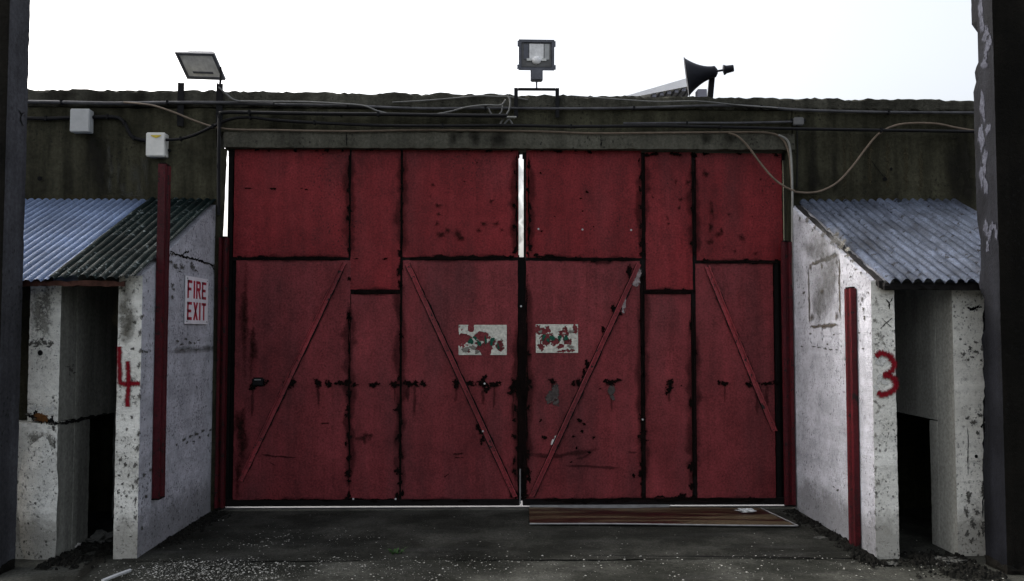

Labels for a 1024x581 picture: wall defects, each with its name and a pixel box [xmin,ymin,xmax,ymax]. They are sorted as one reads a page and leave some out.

spalling [978,0,992,68]
peeling [978,89,991,195]
peeling [983,218,998,252]
crack [169,251,215,270]
crack [25,410,107,426]